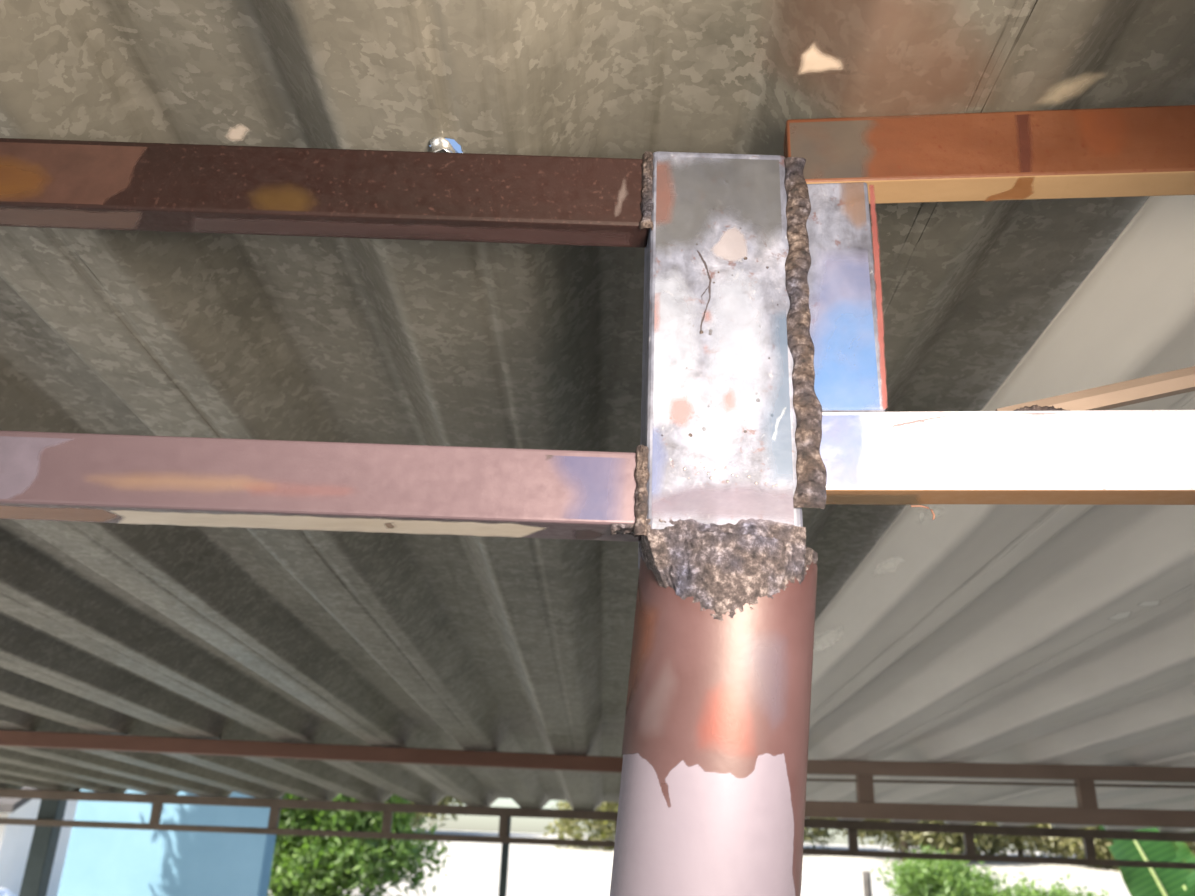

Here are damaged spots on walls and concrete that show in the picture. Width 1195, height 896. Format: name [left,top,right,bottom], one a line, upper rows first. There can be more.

rust [985,114,1034,201]
crack [697,250,711,334]
rust [621,557,818,896]